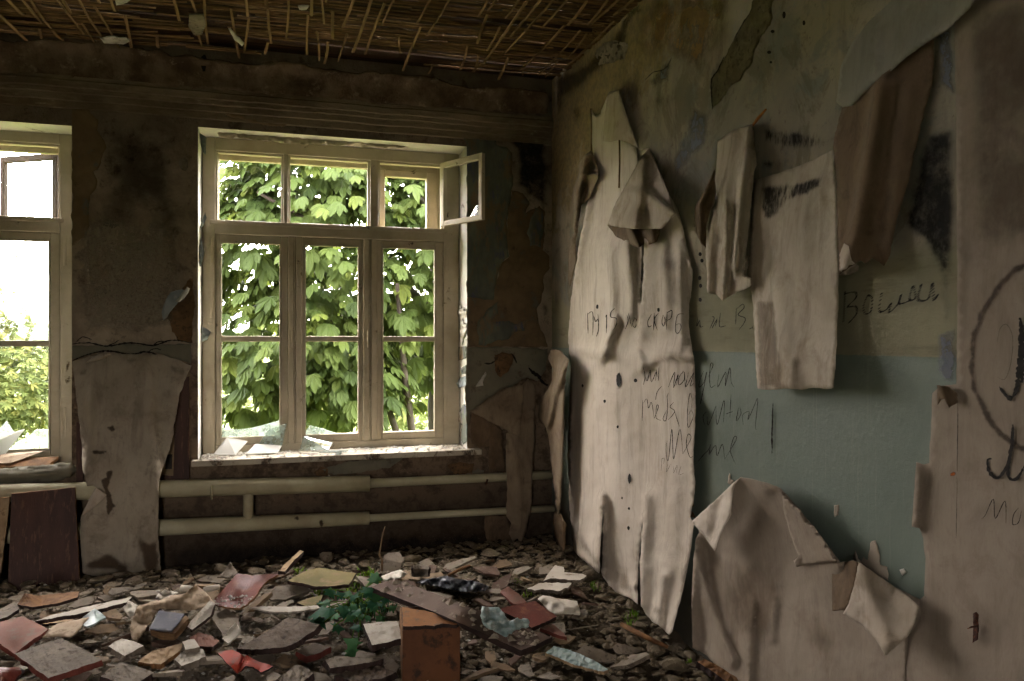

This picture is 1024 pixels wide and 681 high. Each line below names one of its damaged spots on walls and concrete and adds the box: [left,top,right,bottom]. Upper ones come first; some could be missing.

flaking render [712,0,774,107]
peeling [456,138,550,445]
peeling [447,462,484,475]